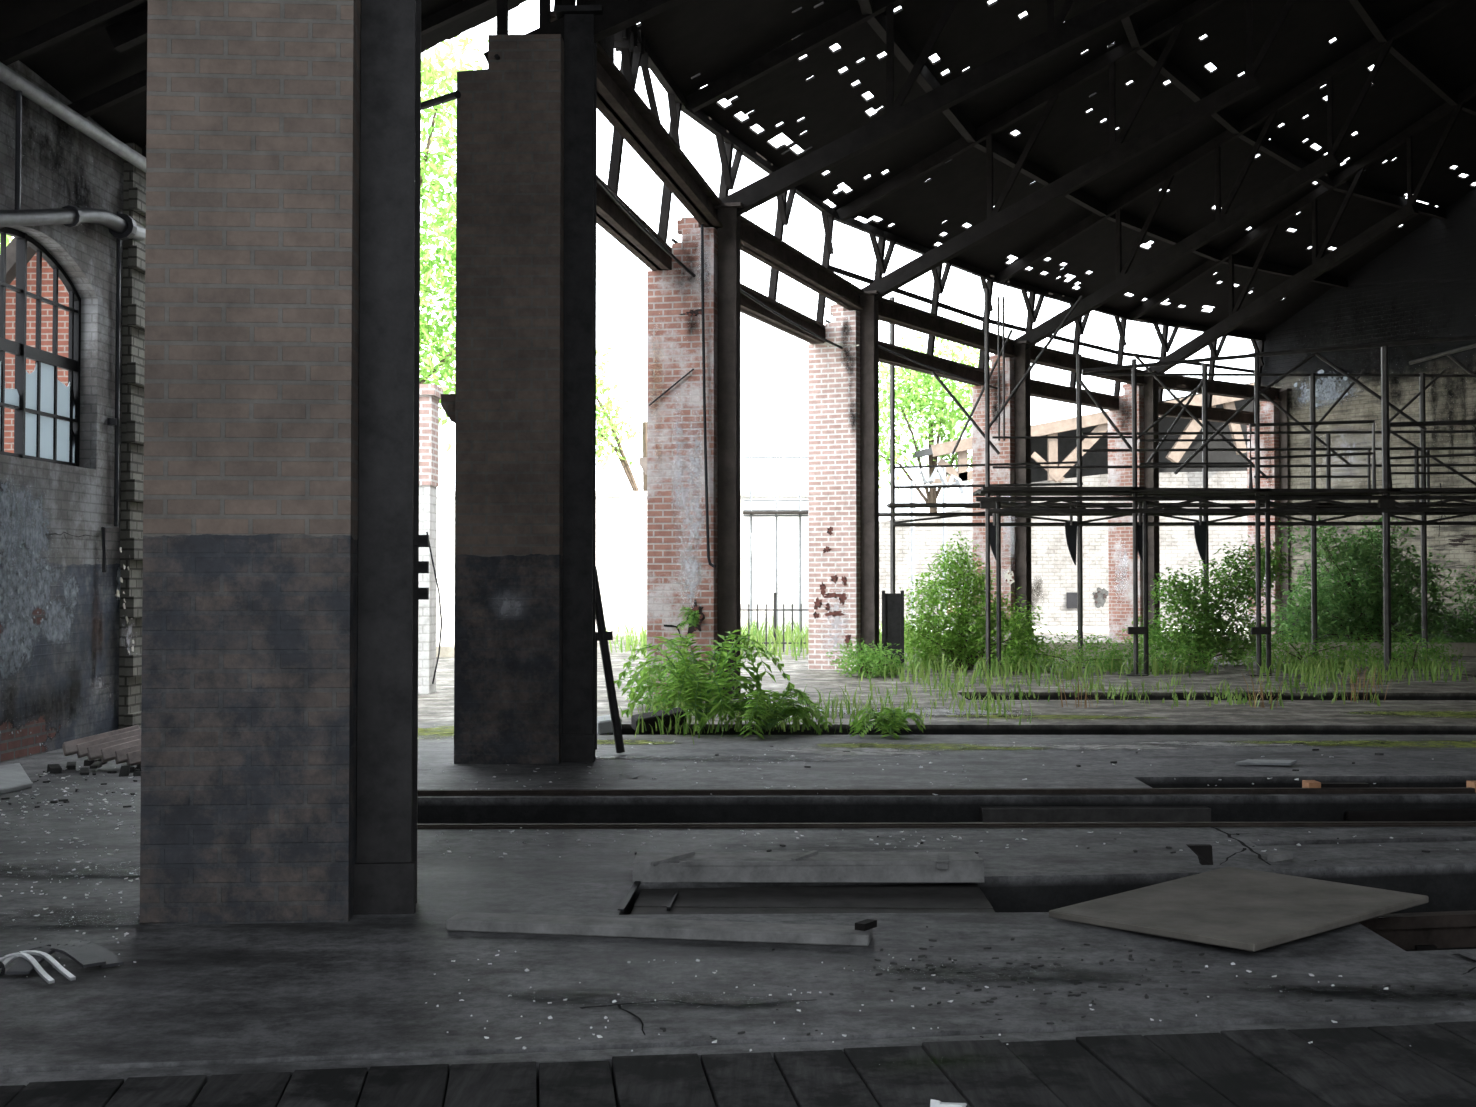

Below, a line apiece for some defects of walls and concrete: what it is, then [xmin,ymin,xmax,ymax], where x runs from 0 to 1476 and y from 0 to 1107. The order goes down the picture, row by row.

leakage [1432,360,1476,457]
peeling [0,481,79,678]
spalling [686,599,705,634]
hole [813,575,847,619]
flaking render [0,714,61,763]